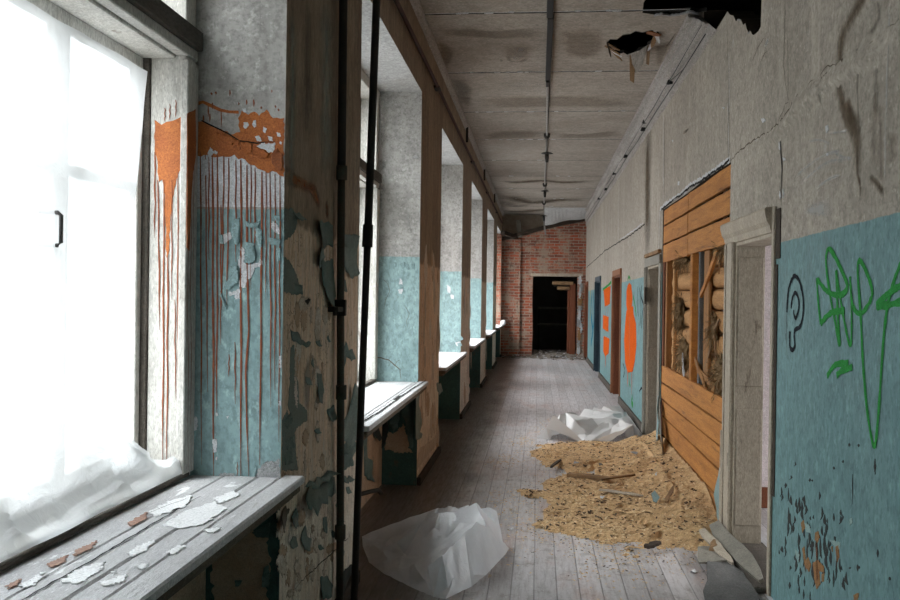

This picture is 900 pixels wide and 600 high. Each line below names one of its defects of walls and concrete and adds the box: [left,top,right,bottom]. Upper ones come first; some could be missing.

water stain [839,0,863,62]
crack [201,120,265,148]
peeling [216,108,283,170]
crack [727,29,835,199]
water stain [837,86,861,192]
peeling [210,208,471,600]
peeling [127,490,240,533]
peeling [779,462,860,600]
peeling [4,540,98,589]
peeling [60,540,155,586]